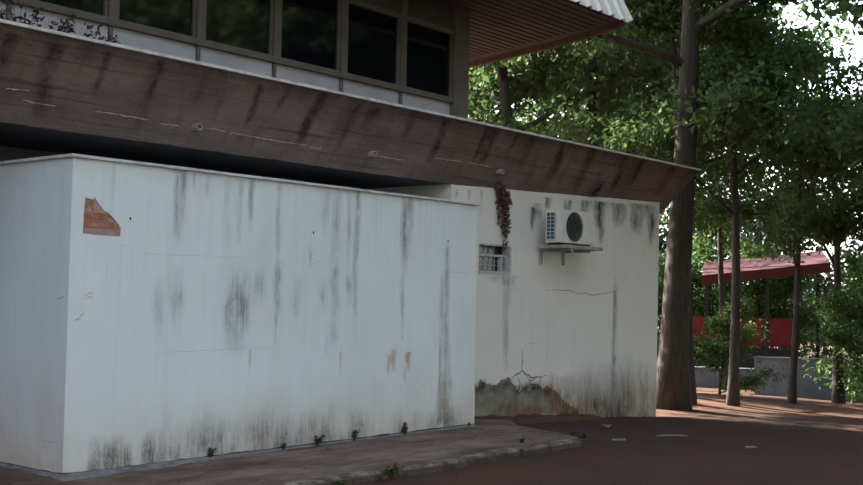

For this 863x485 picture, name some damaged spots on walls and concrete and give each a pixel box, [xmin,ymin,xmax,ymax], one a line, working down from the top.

flaking render [83,197,121,237]
crack [505,309,548,395]
peeling [475,375,579,417]